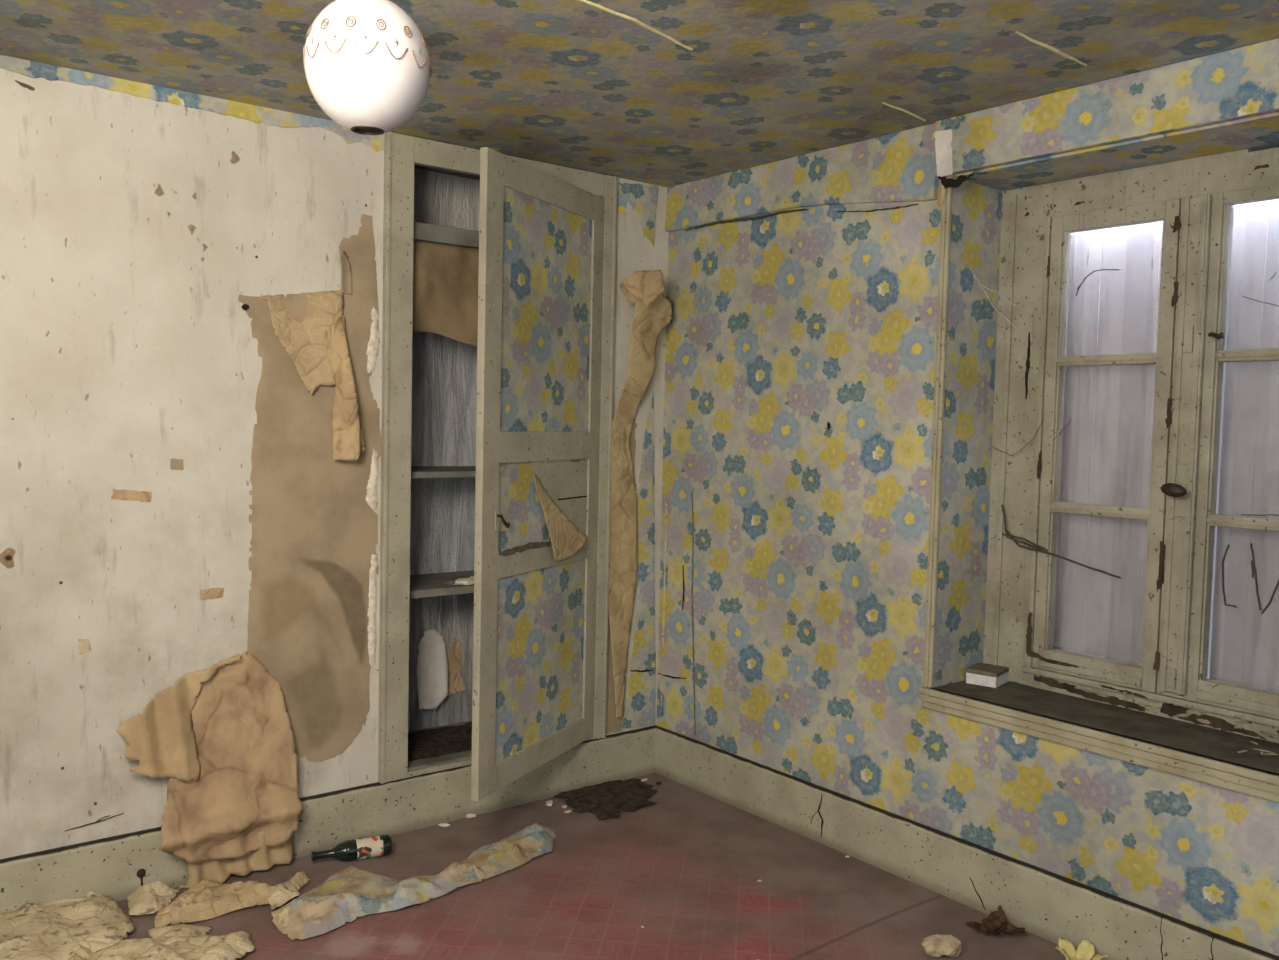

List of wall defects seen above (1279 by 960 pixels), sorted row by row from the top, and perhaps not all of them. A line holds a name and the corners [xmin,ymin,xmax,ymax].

peeling [1171,281,1179,307]
peeling [238,214,381,762]
peeling [1156,541,1166,591]
peeling [1026,612,1279,740]
crack [811,794,823,837]